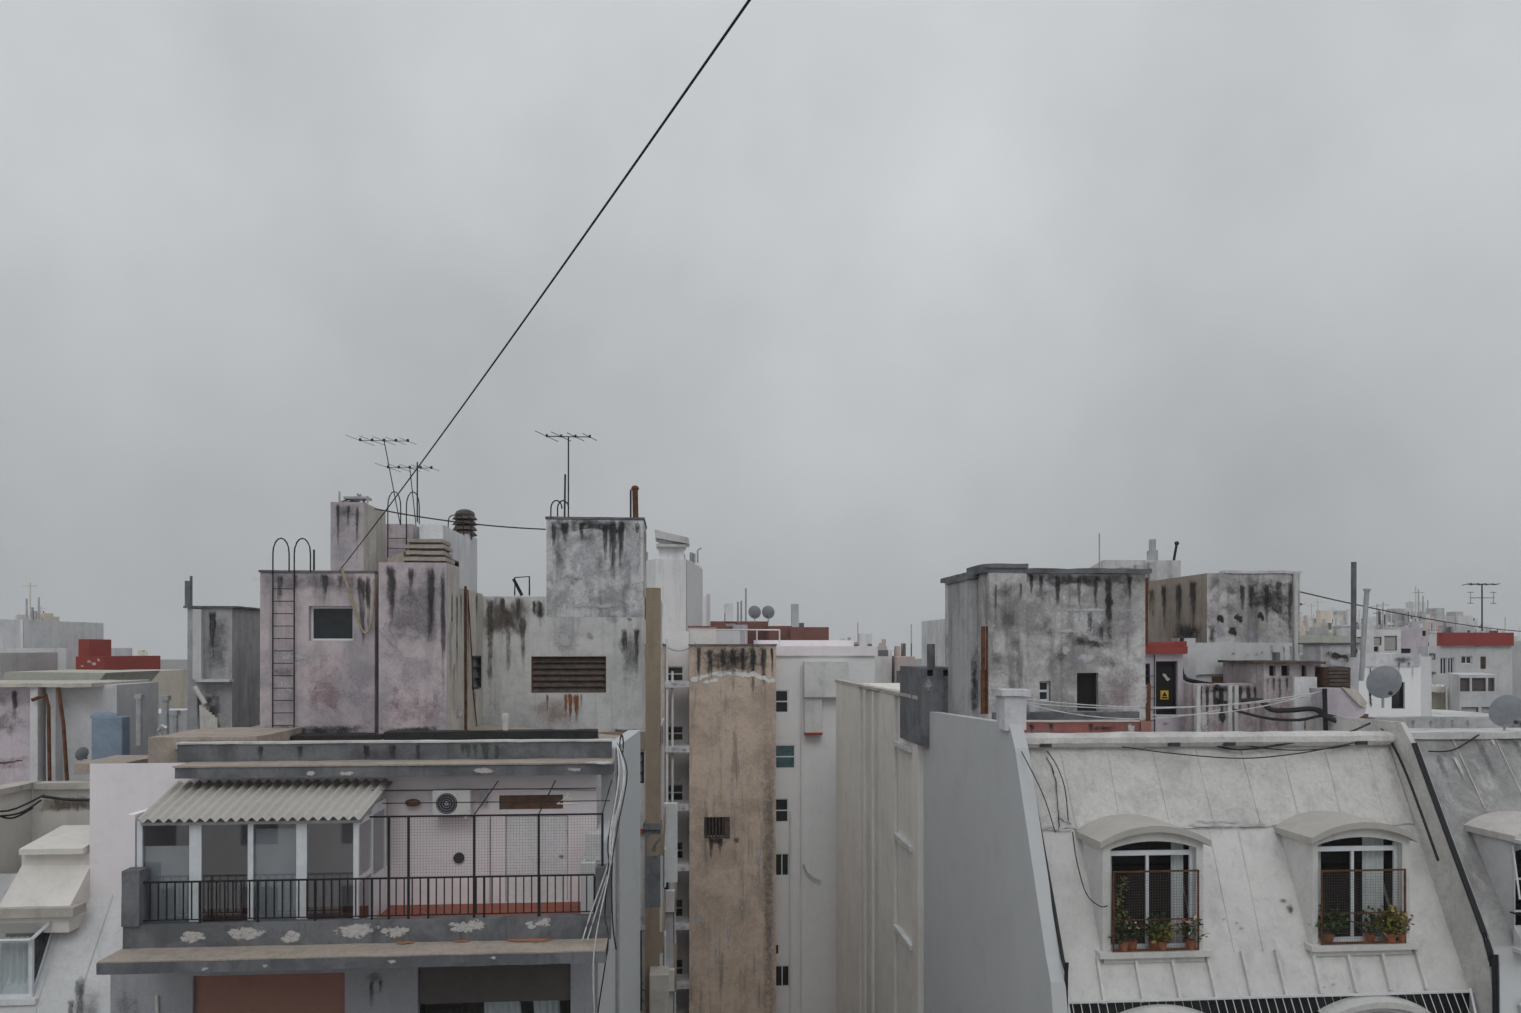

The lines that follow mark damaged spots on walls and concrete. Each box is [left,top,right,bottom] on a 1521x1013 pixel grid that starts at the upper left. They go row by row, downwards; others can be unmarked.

damp [336,505,358,532]
damp [552,523,584,549]
damp [603,522,647,565]
damp [321,568,542,675]
damp [995,575,1131,665]
damp [1149,582,1195,626]
damp [1240,582,1292,626]
damp [697,647,773,676]
rust [546,694,582,717]